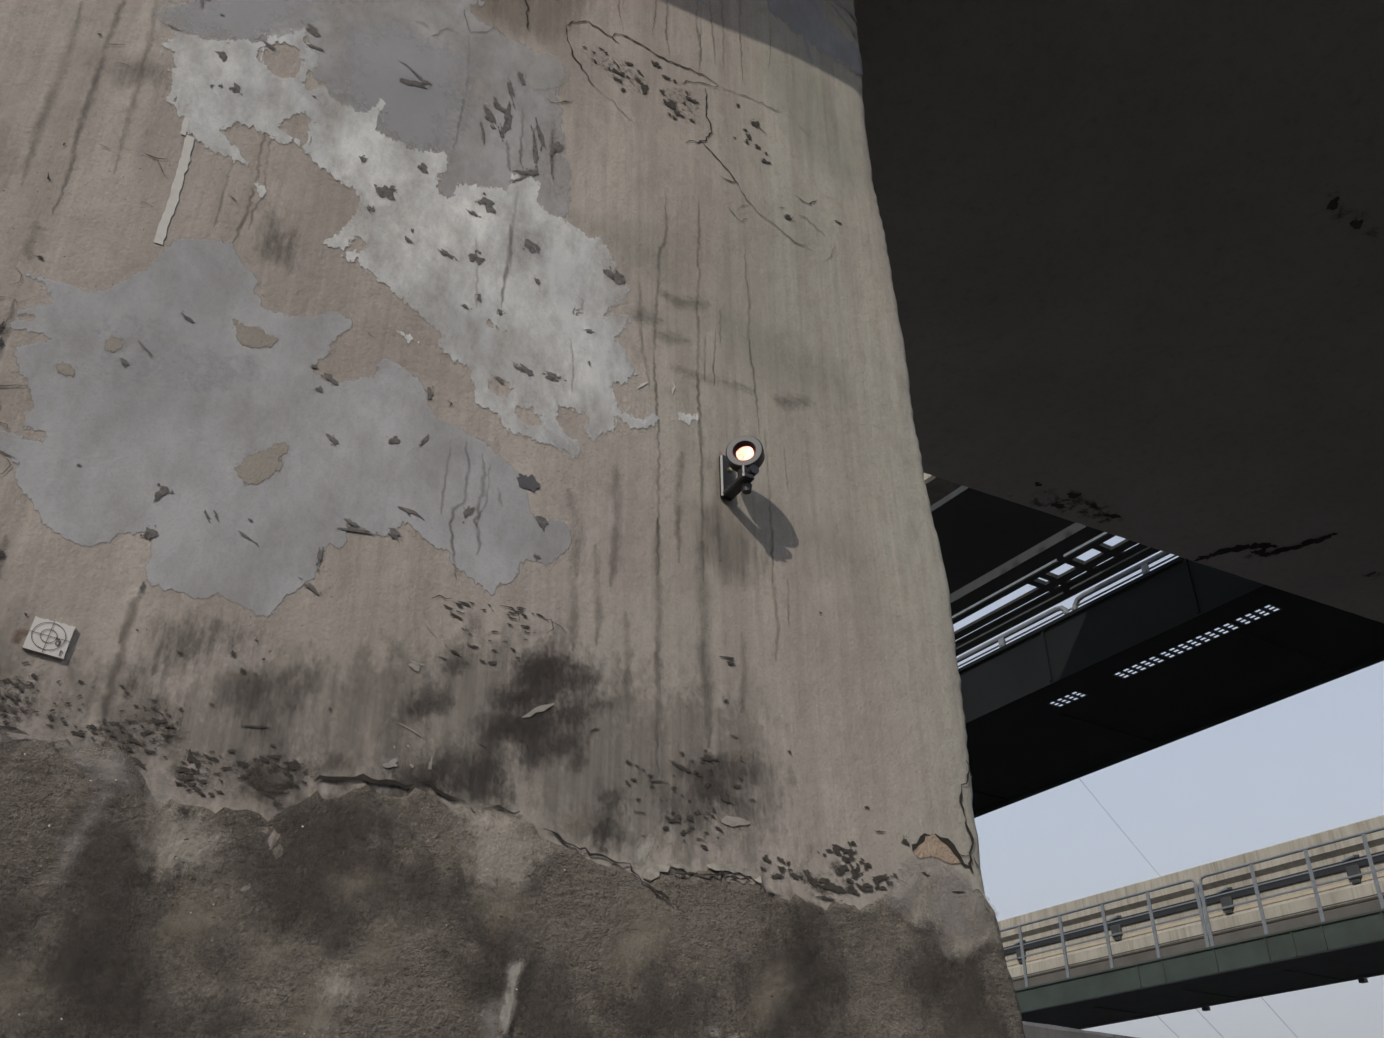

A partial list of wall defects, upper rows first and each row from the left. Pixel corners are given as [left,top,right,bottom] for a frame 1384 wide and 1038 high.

spalling [583,46,701,122]
crack [548,20,834,261]
peeling [367,184,398,214]
peeling [466,192,496,218]
crack [1193,533,1338,561]
damp [149,797,220,873]
damp [241,600,599,1038]
crack [314,773,670,901]
damp [593,794,620,852]
spalling [760,841,898,905]
crack [959,761,981,873]
damp [635,837,845,1038]